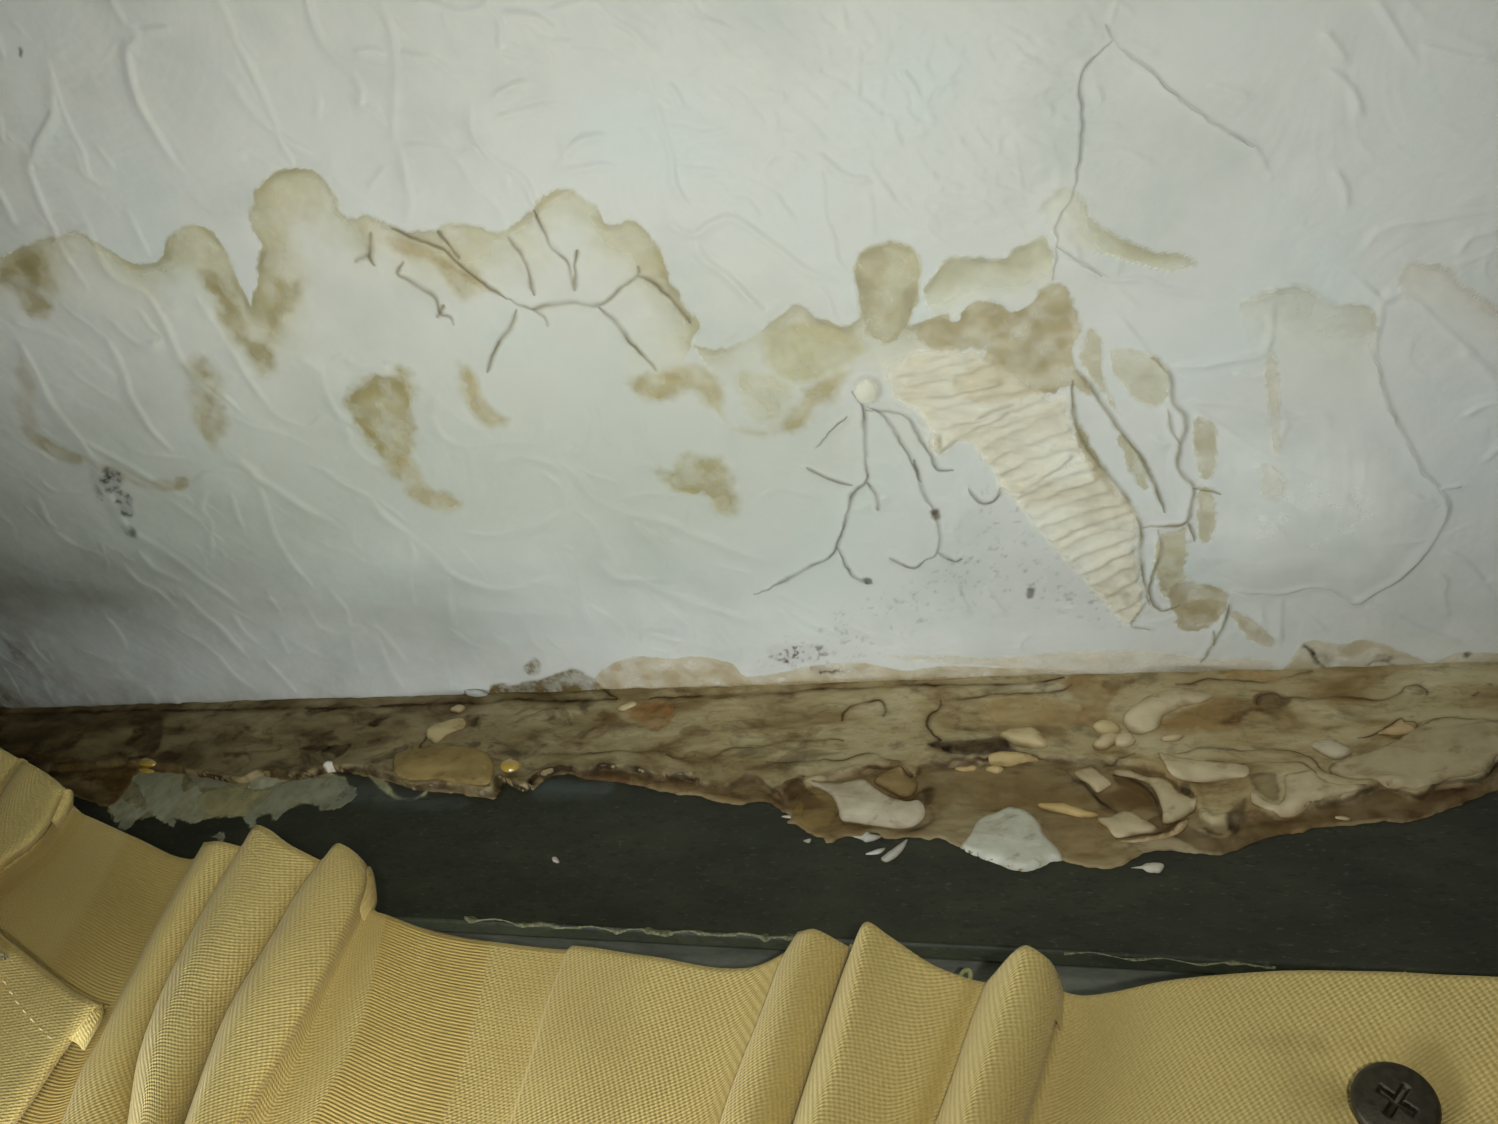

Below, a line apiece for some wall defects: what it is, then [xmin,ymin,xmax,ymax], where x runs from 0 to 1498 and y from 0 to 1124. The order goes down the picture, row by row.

damp [194,227,283,322]
crack [368,228,508,300]
damp [769,238,1100,402]
damp [347,376,409,456]
crack [808,469,871,584]
crack [827,396,998,505]
crack [1071,380,1221,612]
damp [1155,420,1271,645]
peeling [811,765,926,862]
peeling [927,726,1048,774]
peeling [960,803,1098,872]
spalling [1075,690,1498,843]